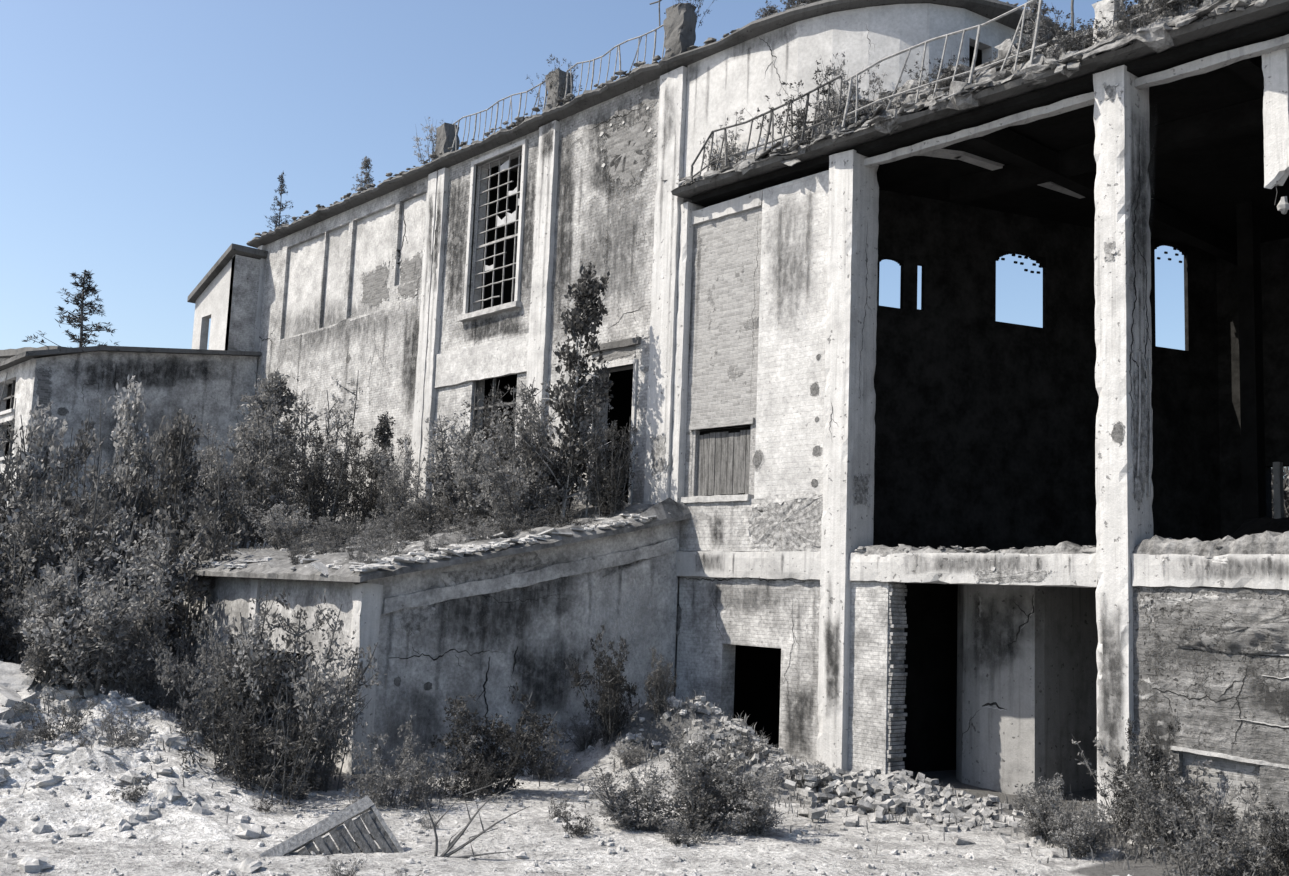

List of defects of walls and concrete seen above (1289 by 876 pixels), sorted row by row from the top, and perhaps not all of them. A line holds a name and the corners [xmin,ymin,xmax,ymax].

leakage [591,101,651,192]
spalling [360,251,423,309]
spalling [742,491,823,552]
leakage [443,564,560,641]
crack [389,647,518,745]
leakage [514,655,585,721]
crack [1152,652,1289,750]